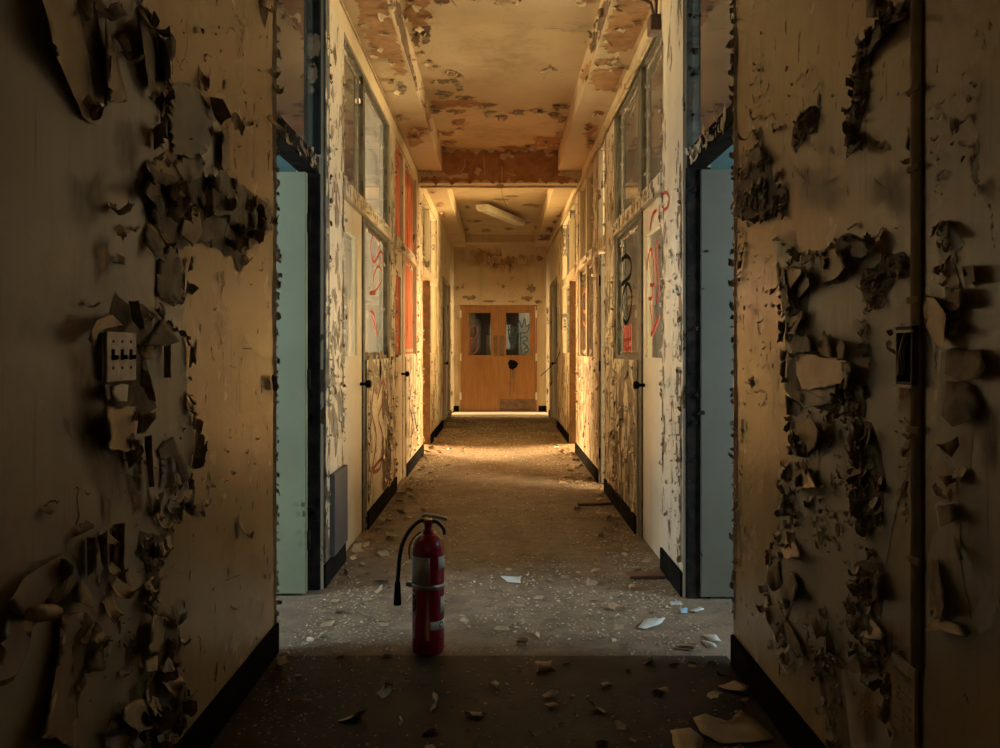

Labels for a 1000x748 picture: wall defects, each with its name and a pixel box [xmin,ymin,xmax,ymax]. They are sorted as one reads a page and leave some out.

peeling [0,0,577,748]
peeling [525,0,910,748]
peeling [923,220,987,637]